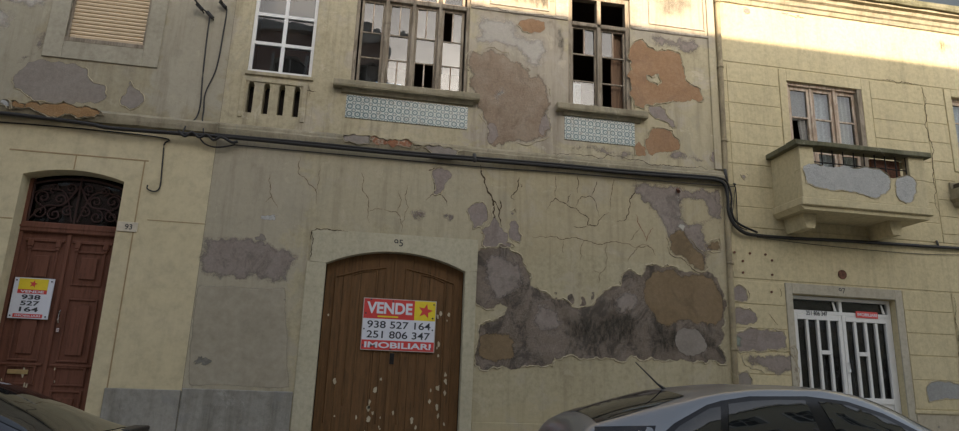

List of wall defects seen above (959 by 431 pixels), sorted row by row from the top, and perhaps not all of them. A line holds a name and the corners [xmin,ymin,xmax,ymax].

peeling [0,59,108,123]
peeling [632,36,705,103]
peeling [645,101,714,162]
crack [881,79,940,214]
crack [362,168,447,231]
crack [480,165,522,224]
crack [534,153,713,281]
peeling [802,163,917,204]
peeling [199,234,295,282]
peeling [719,284,800,386]
peeling [355,377,394,431]